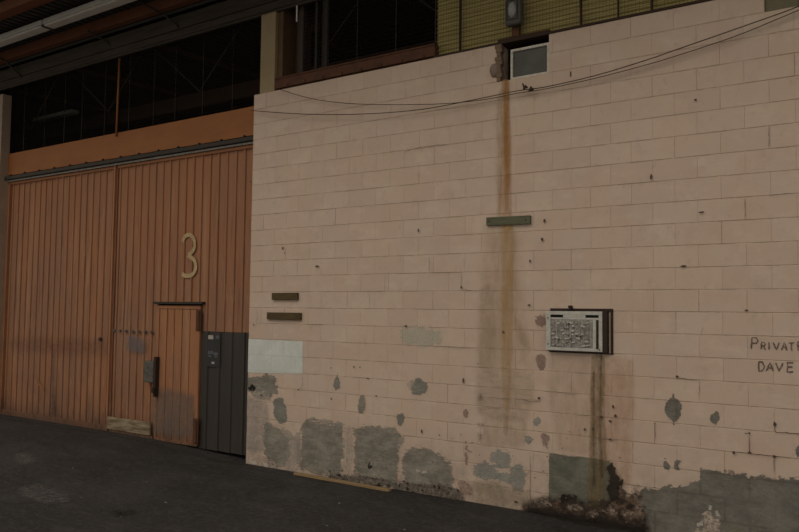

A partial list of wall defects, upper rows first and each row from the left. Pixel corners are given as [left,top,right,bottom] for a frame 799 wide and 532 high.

spalling [526,457,652,532]
peeling [695,505,721,532]